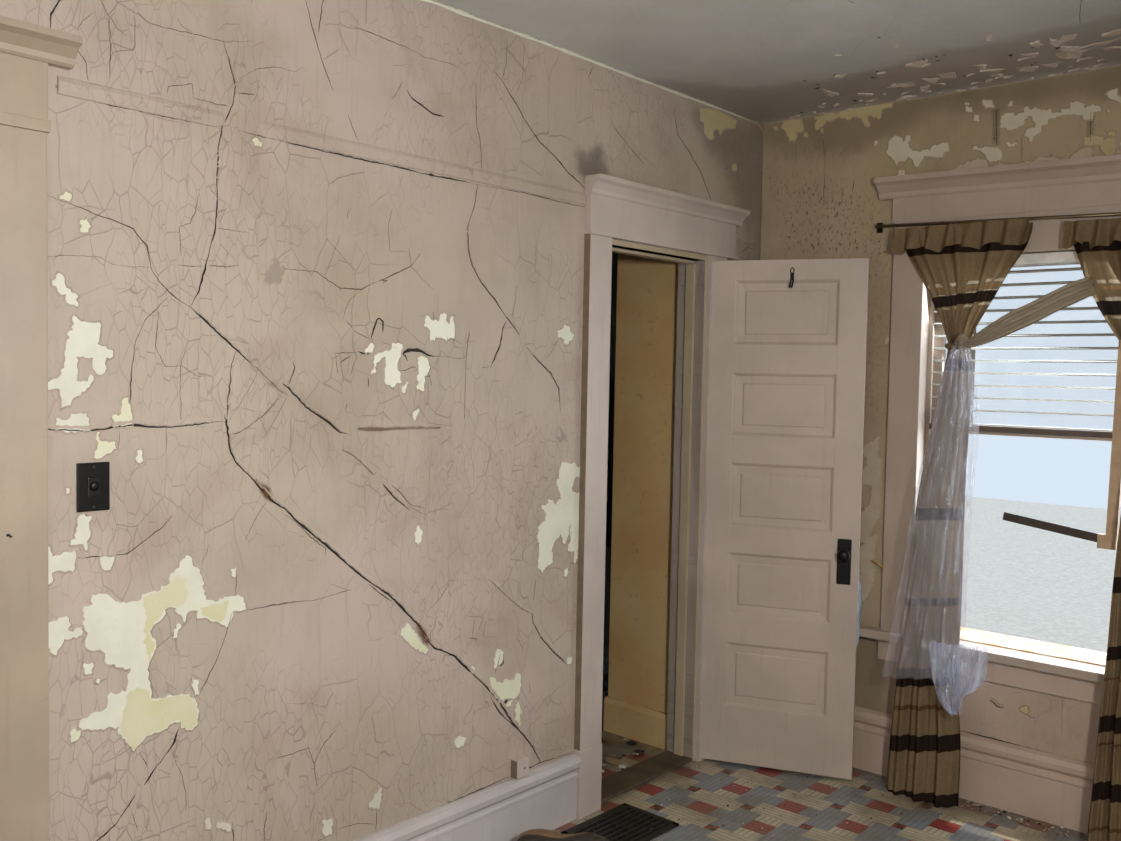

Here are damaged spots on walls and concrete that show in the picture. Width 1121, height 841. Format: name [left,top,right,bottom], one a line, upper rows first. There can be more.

peeling [422,0,754,141]
peeling [772,29,1121,176]
peeling [48,270,135,461]
crack [48,0,583,806]
peeling [363,311,456,395]
peeling [536,460,580,578]
peeling [49,553,248,754]
peeling [399,621,430,656]
peeling [488,647,523,727]
crack [97,730,187,841]